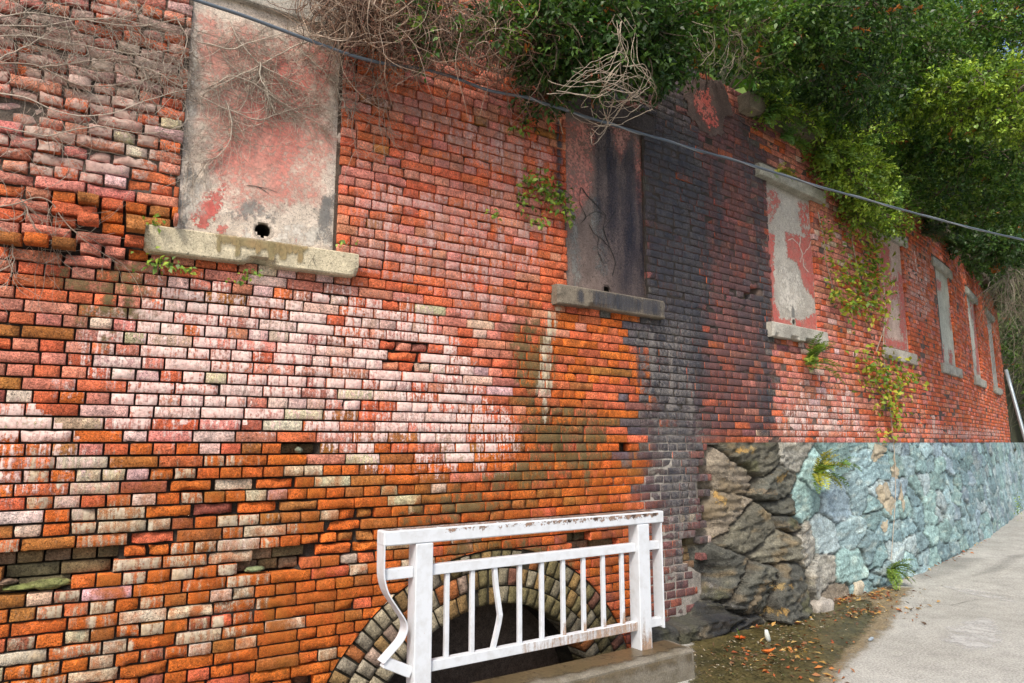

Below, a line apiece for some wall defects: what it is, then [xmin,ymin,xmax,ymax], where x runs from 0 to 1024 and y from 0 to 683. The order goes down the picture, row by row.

peeling [179,16,336,242]
peeling [682,77,733,138]
leakage [209,224,332,263]
peeling [766,188,817,330]
leakage [79,269,522,479]
spalling [379,341,429,372]
leakage [472,90,910,683]
spalling [0,531,173,592]